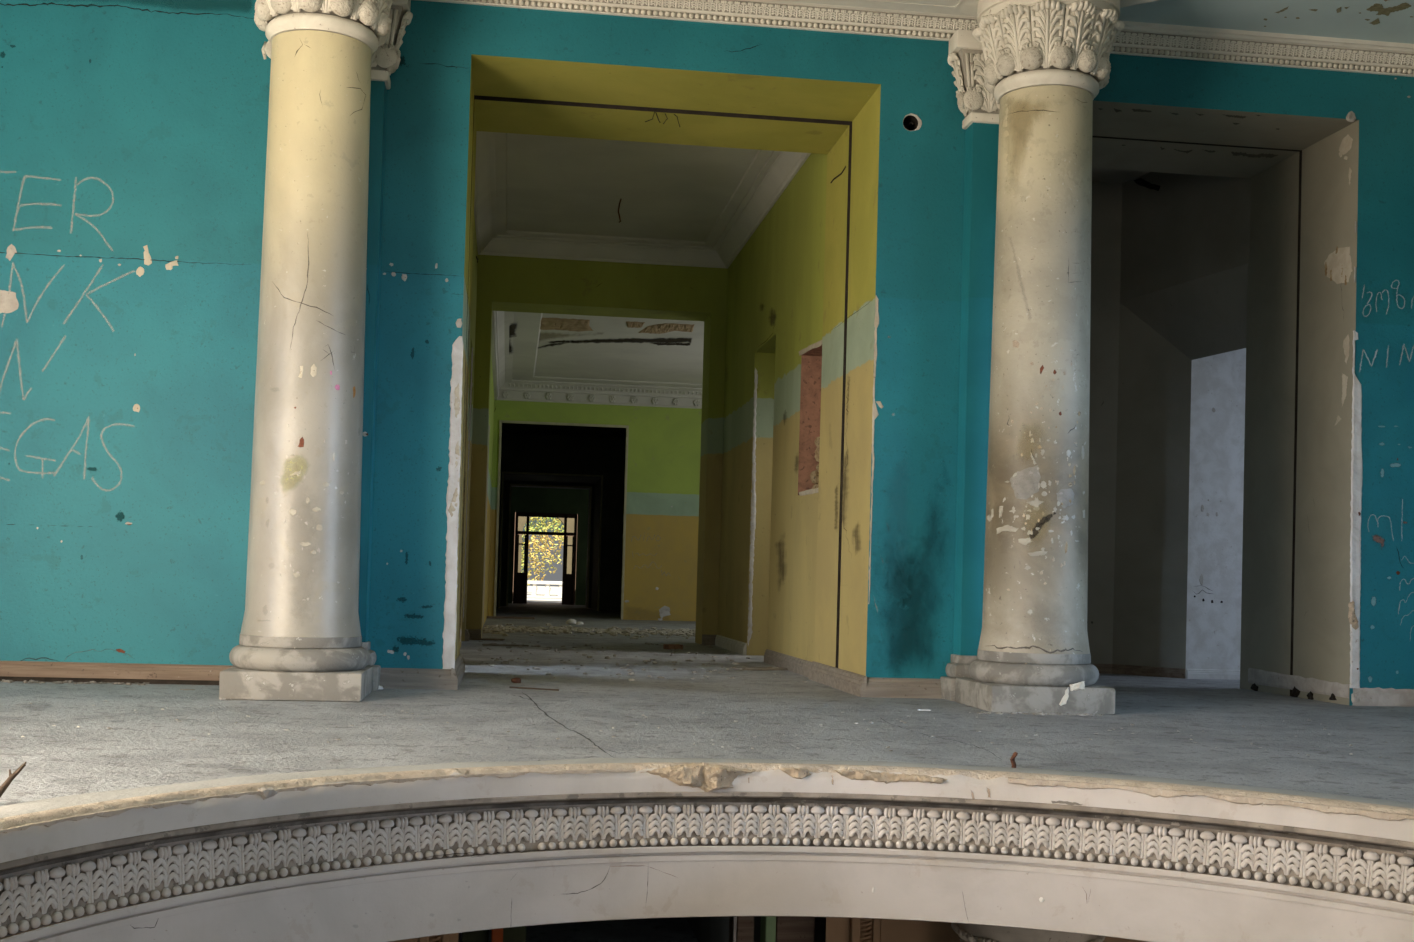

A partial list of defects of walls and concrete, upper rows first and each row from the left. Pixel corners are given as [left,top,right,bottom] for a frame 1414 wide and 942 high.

peeling [1336,0,1412,25]
peeling [540,317,593,332]
peeling [626,321,695,334]
spalling [987,348,1085,596]
crack [514,692,632,758]
spalling [0,762,757,833]